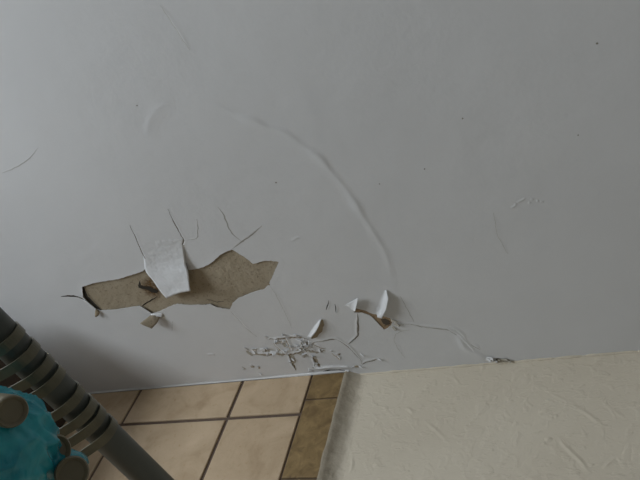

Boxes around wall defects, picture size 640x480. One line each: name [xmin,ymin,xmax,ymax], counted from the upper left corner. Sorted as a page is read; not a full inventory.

crack [168,209,198,270]
crack [217,207,262,248]
peeling [77,239,284,329]
peeling [345,290,401,332]
peeling [244,319,341,372]